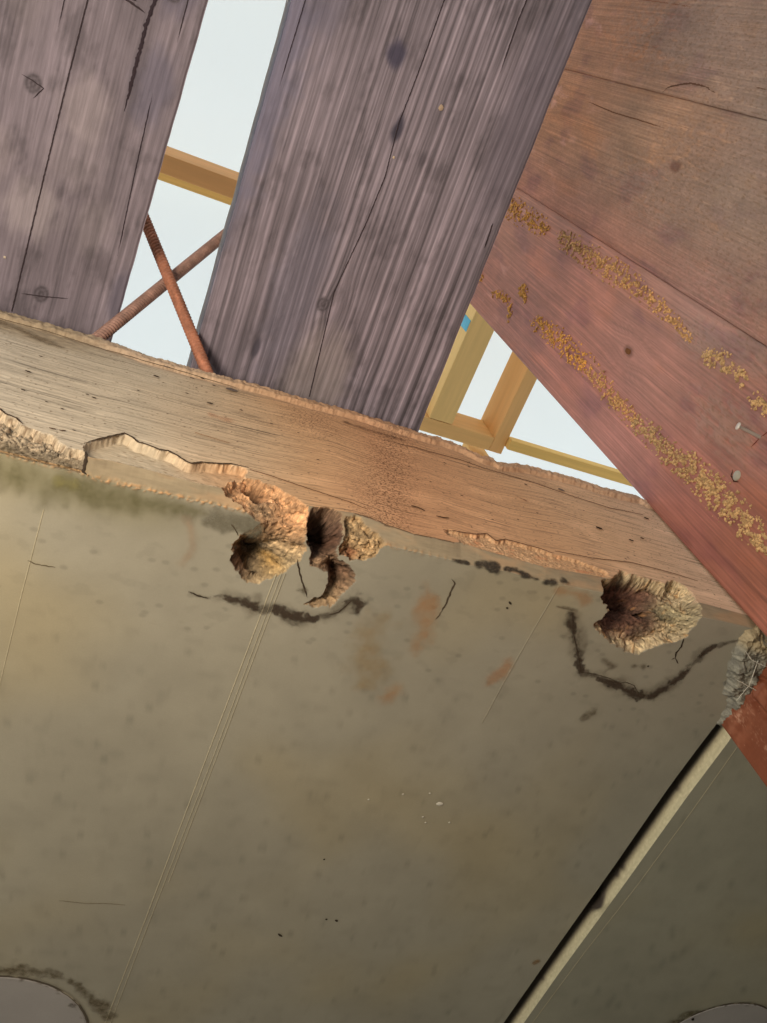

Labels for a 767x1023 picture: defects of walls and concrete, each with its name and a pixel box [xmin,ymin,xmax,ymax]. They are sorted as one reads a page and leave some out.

spalling [0,408,386,608]
leakage [224,596,258,611]
leakage [272,599,364,622]
leakage [562,607,689,702]